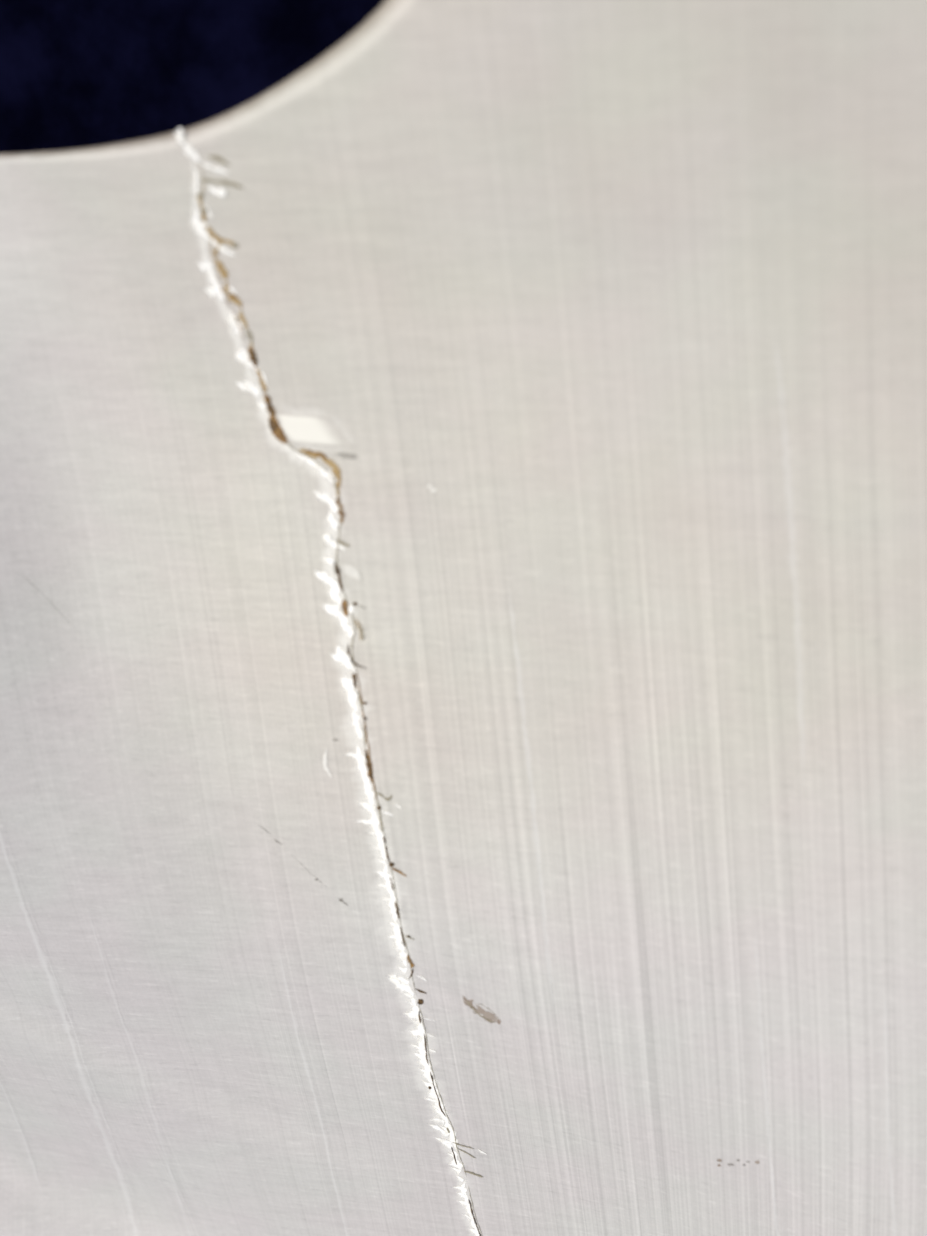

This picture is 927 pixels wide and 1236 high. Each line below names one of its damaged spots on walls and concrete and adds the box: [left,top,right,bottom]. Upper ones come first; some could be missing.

crack [175,128,487,1236]